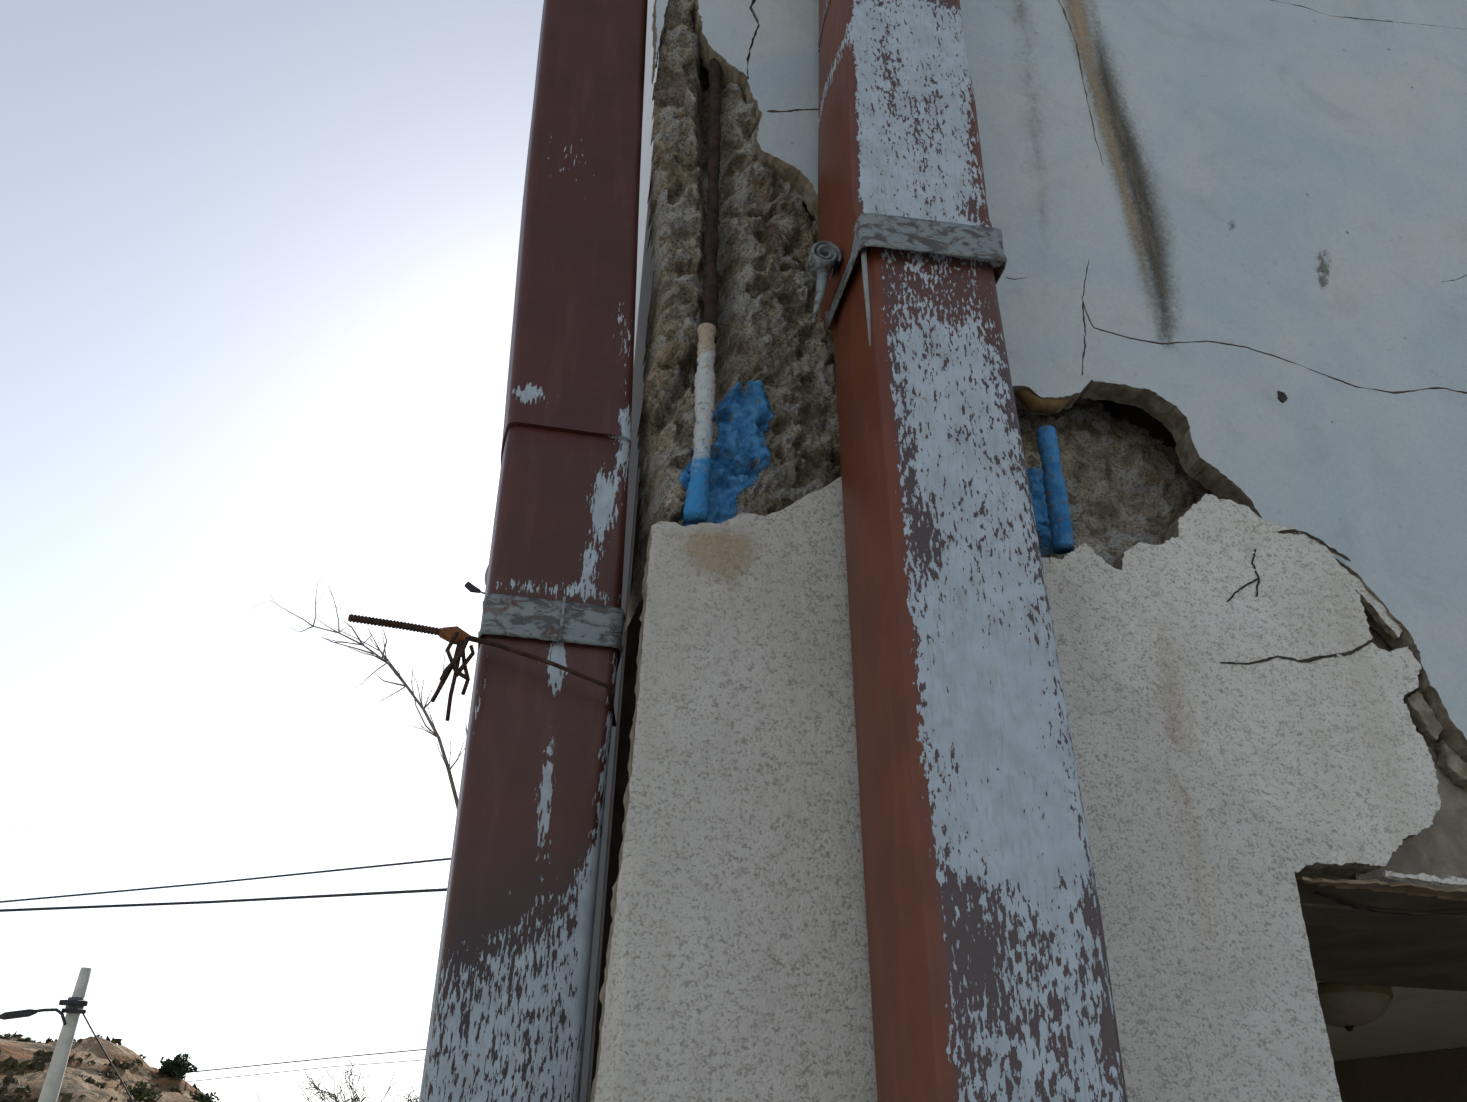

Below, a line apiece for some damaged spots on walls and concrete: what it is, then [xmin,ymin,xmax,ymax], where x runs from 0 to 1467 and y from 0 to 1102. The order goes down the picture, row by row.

crack [747,0,758,80]
spalling [625,0,841,631]
spalling [1016,389,1215,566]
crack [1227,529,1351,602]
peeling [1341,566,1402,652]
crack [1220,640,1373,665]
peeling [1302,691,1467,901]